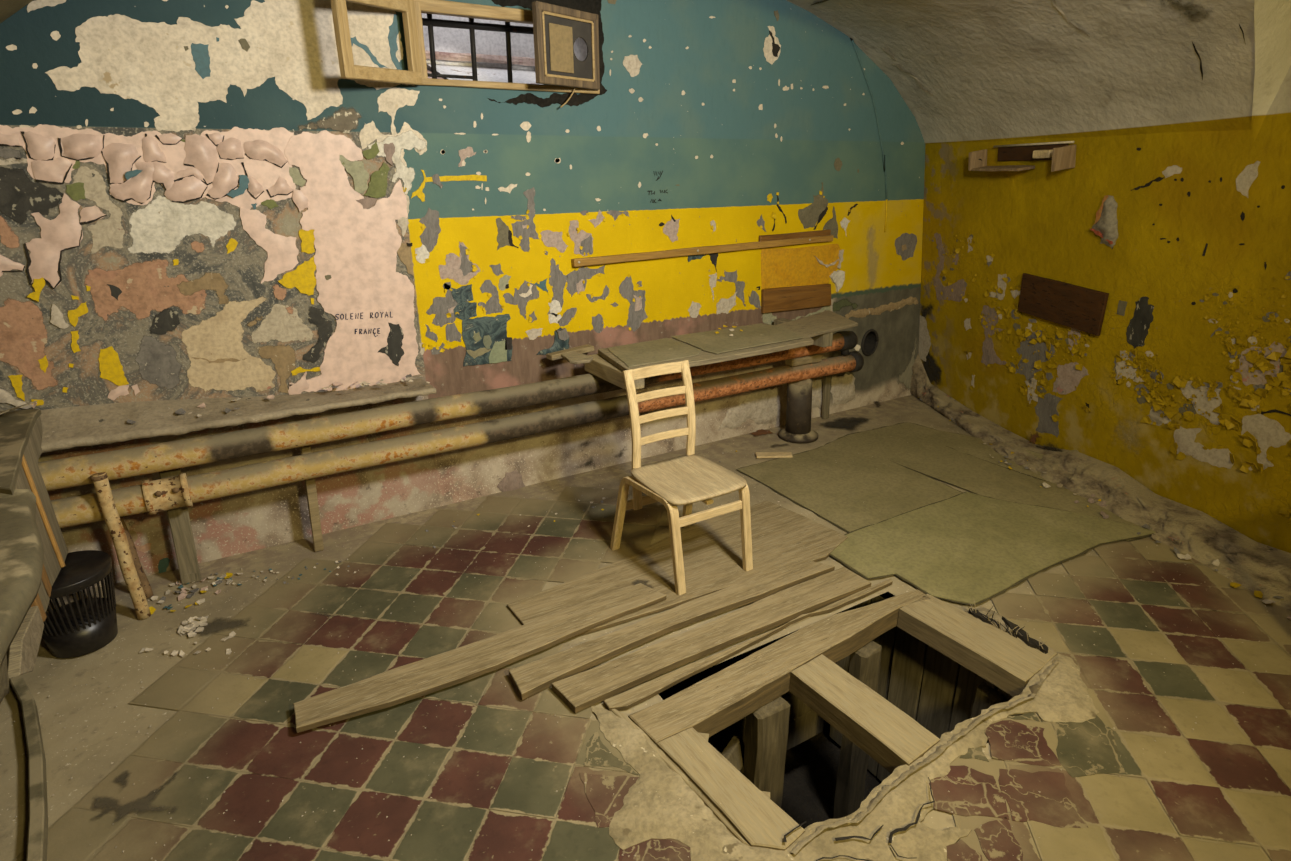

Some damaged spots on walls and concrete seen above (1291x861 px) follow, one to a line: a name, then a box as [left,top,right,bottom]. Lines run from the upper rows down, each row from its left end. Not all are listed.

peeling [0,0,652,417]
peeling [659,215,680,242]
peeling [688,182,918,325]
peeling [1208,161,1260,221]
flaking render [718,386,781,431]
flaking render [811,374,856,409]
spalling [895,233,1291,620]
spalling [834,592,895,615]
spalling [658,630,797,700]
spalling [708,601,1060,855]
crack [783,821,806,842]
crack [815,777,935,861]